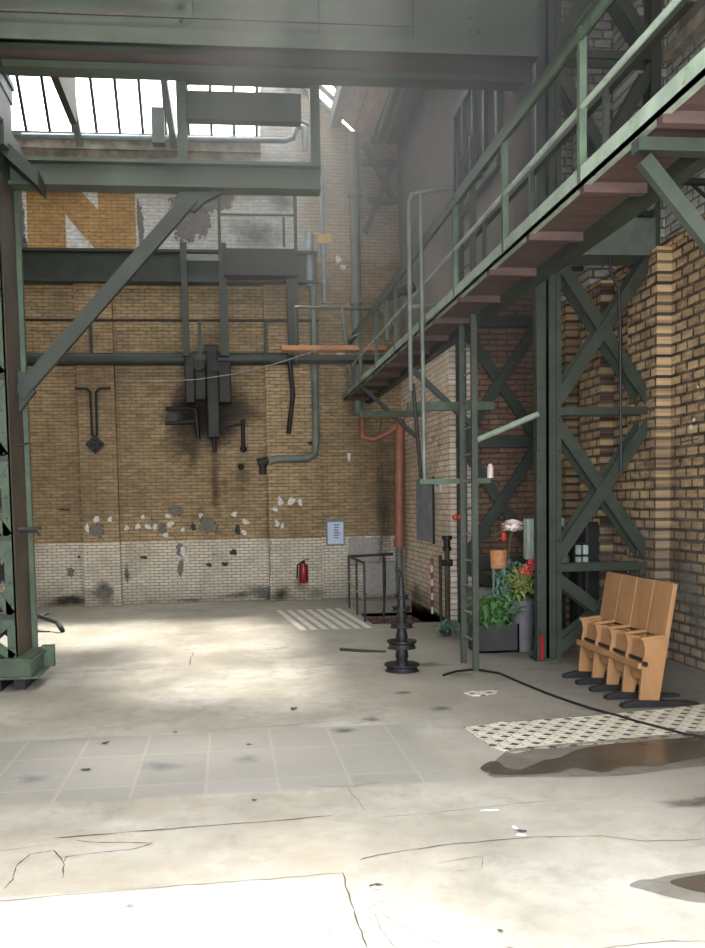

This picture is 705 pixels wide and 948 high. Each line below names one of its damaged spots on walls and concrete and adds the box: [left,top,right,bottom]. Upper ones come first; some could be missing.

spalling [85,516,112,539]
spalling [124,507,219,538]
spalling [231,511,250,535]
spalling [271,496,302,529]
crack [362,836,567,872]
crack [0,815,449,948]
crack [605,940,677,948]